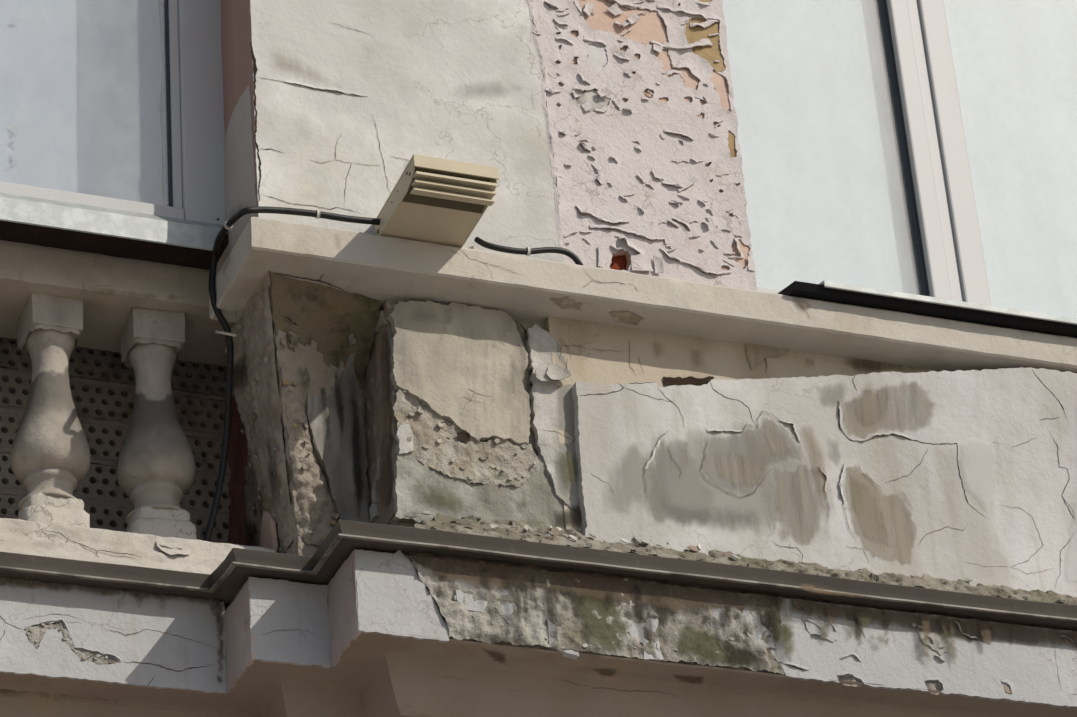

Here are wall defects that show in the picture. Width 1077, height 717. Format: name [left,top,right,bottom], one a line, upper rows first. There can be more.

crack [250,43,409,212]
crack [525,0,564,247]
peeling [544,0,736,158]
spalling [564,200,755,275]
spalling [225,286,339,554]
spalling [393,388,539,487]
crack [837,371,1077,587]
crack [0,614,82,640]
spalling [25,618,122,665]
crack [111,629,215,685]
spalling [405,555,787,674]
leakage [414,554,1077,665]